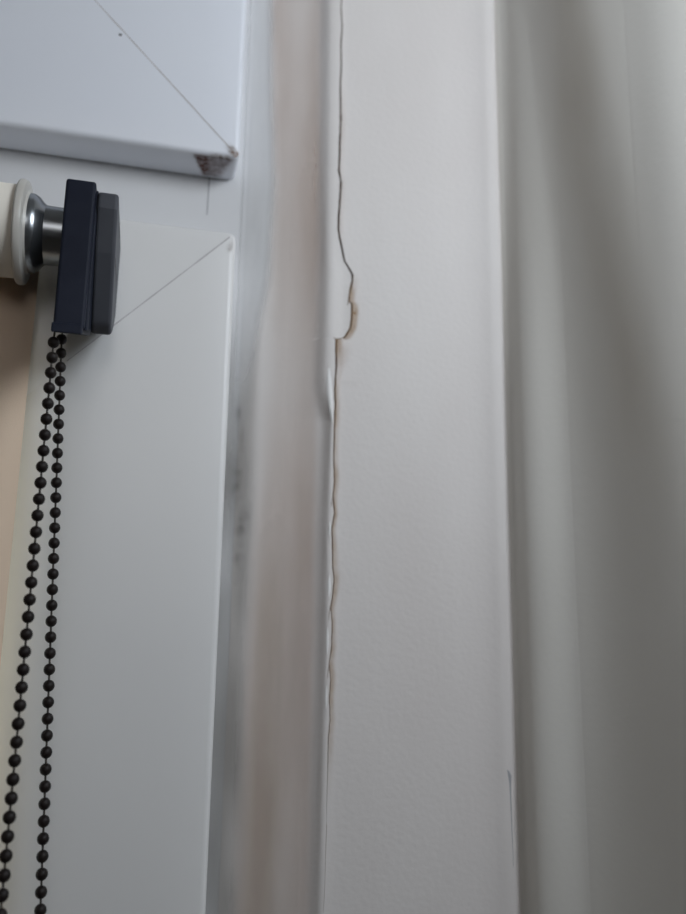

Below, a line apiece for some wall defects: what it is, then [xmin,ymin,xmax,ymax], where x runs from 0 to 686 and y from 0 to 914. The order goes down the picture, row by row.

crack [325,0,354,866]